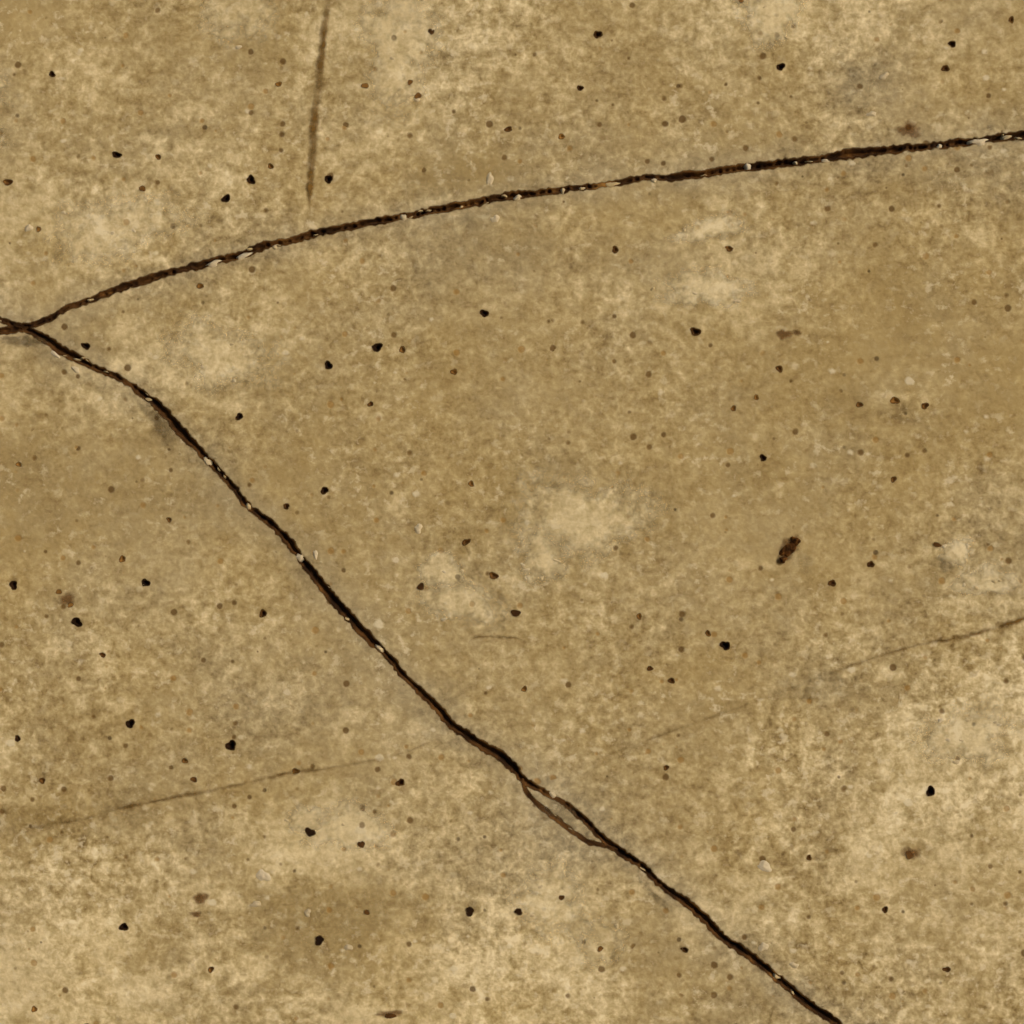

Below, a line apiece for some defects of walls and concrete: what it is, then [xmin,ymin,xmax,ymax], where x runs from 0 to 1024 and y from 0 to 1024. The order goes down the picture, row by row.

crack [0,130,1024,335]
crack [22,326,842,1024]
crack [938,617,1024,642]